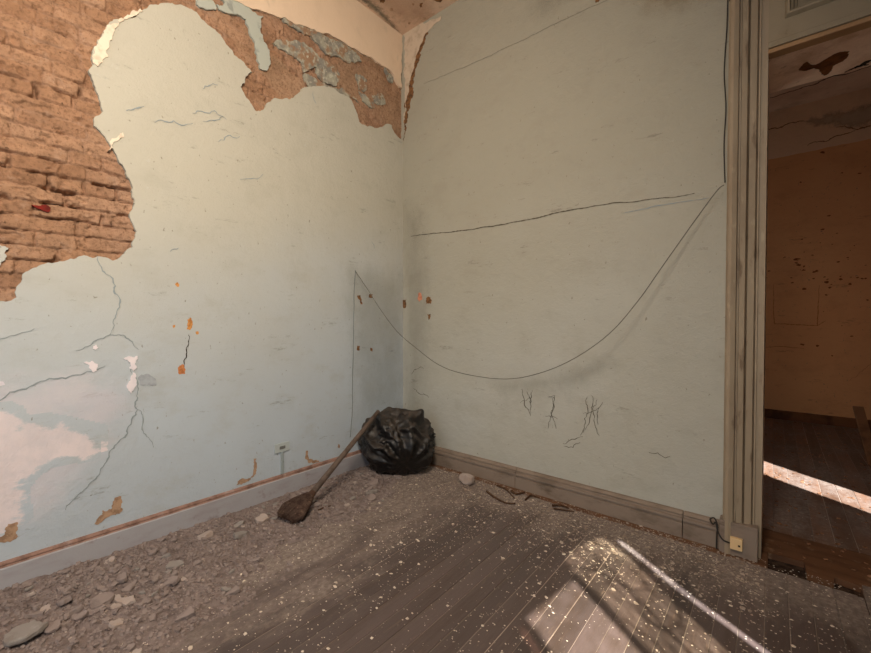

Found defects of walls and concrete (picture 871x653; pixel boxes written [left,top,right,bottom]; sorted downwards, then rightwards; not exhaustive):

crack [771,60,871,98]
peeling [799,51,849,75]
flaking render [0,0,428,302]
crack [415,193,706,236]
crack [76,257,139,351]
crack [0,367,103,401]
peeling [124,356,138,393]
crack [65,369,154,510]
peeling [0,401,101,543]
peeling [237,459,257,485]
peeling [94,496,123,525]